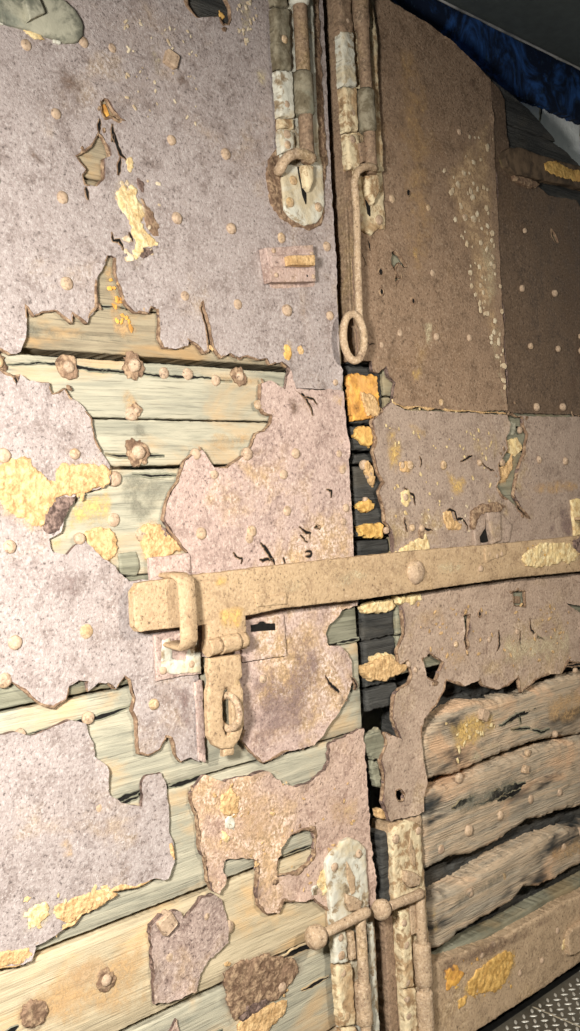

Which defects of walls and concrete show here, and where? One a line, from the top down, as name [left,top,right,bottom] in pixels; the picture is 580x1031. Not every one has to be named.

peeling [284,344,304,360]
corrosion [140,523,183,560]
corrosion [562,512,580,553]
peeling [220,788,240,843]
peeling [311,869,327,895]